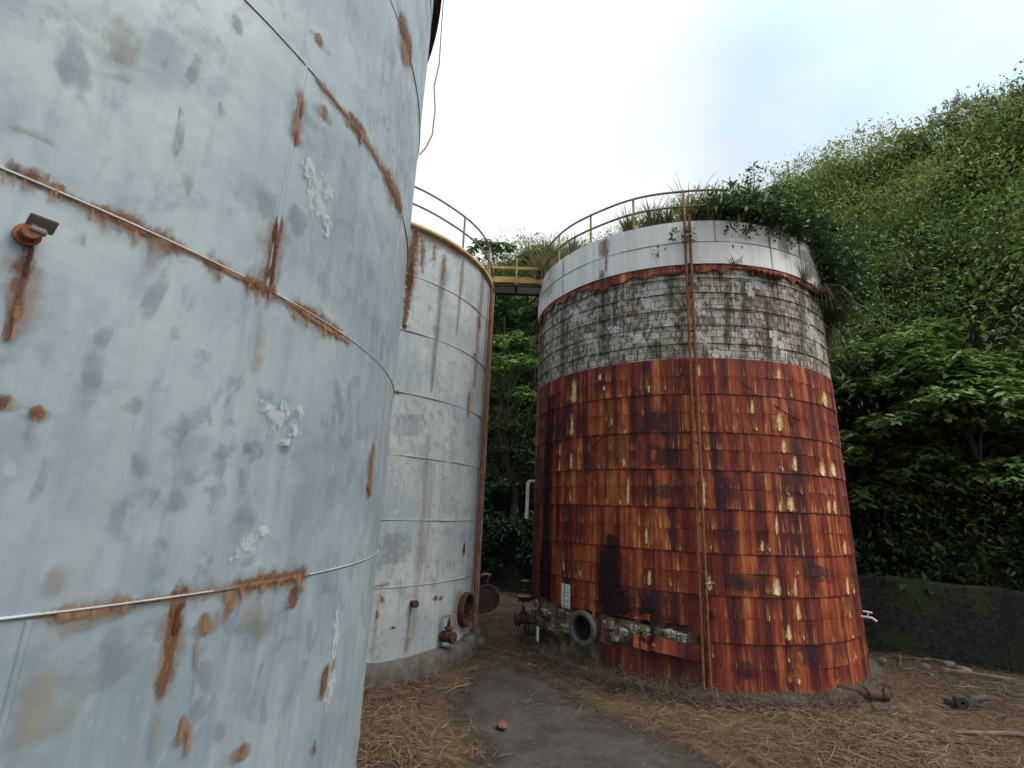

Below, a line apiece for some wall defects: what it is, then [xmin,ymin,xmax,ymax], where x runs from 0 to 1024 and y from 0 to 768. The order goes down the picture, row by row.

rust [293,93,303,145]
rust [317,79,403,212]
peeling [305,157,333,237]
rust [2,163,350,344]
rust [402,231,464,329]
water stain [600,271,617,356]
water stain [725,279,747,357]
rust [0,395,12,410]
peeling [261,401,302,445]
water stain [590,551,611,614]
rust [47,567,308,697]
peeling [603,619,687,643]